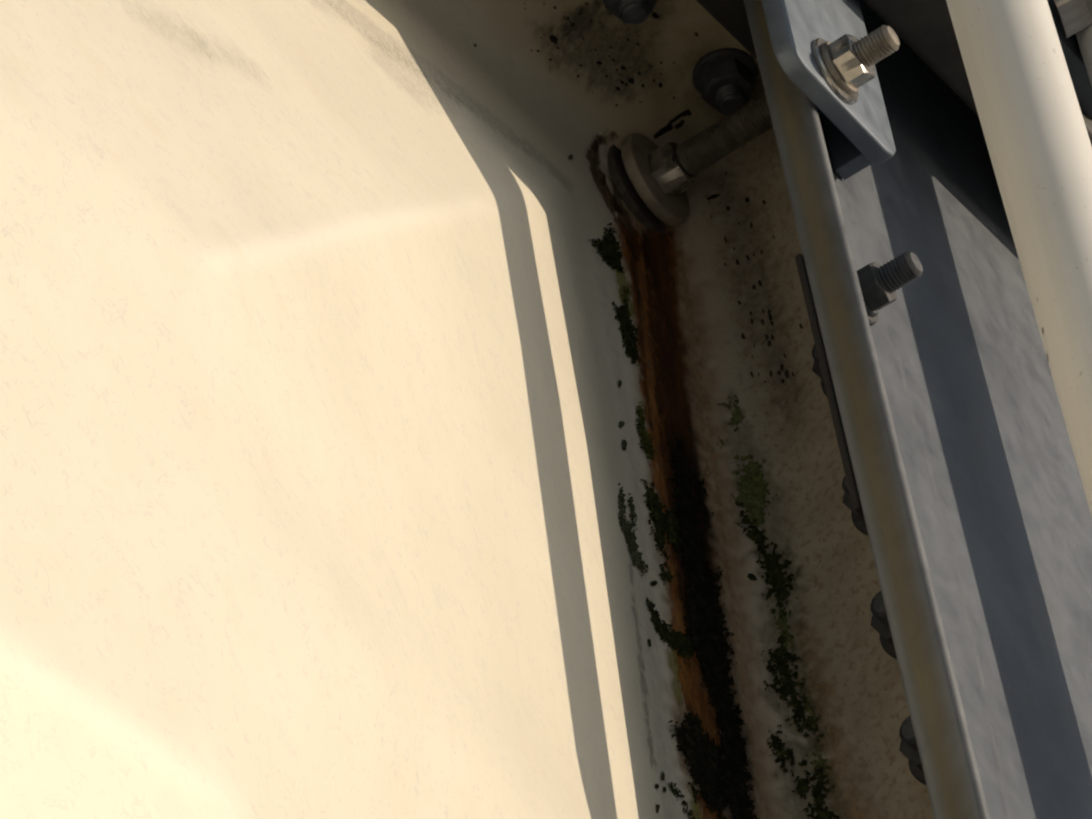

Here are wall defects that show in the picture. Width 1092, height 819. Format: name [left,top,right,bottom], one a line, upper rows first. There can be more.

rust [587,132,770,819]
damp [757,0,957,819]